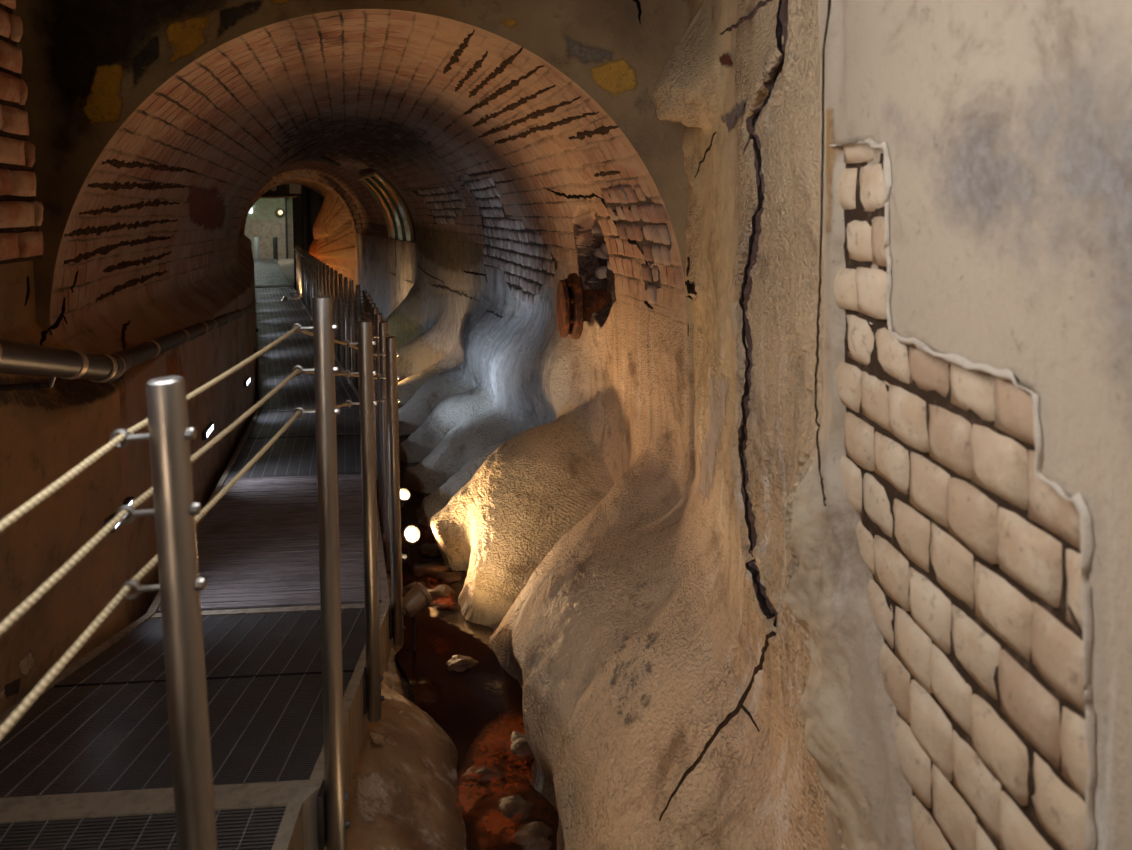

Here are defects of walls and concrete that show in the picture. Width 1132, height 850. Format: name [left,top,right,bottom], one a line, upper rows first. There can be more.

peeling [82,0,293,125]
peeling [591,60,636,96]
flaking render [573,184,672,327]
crack [659,0,788,821]
crack [814,0,831,506]
flaking render [829,138,1097,850]